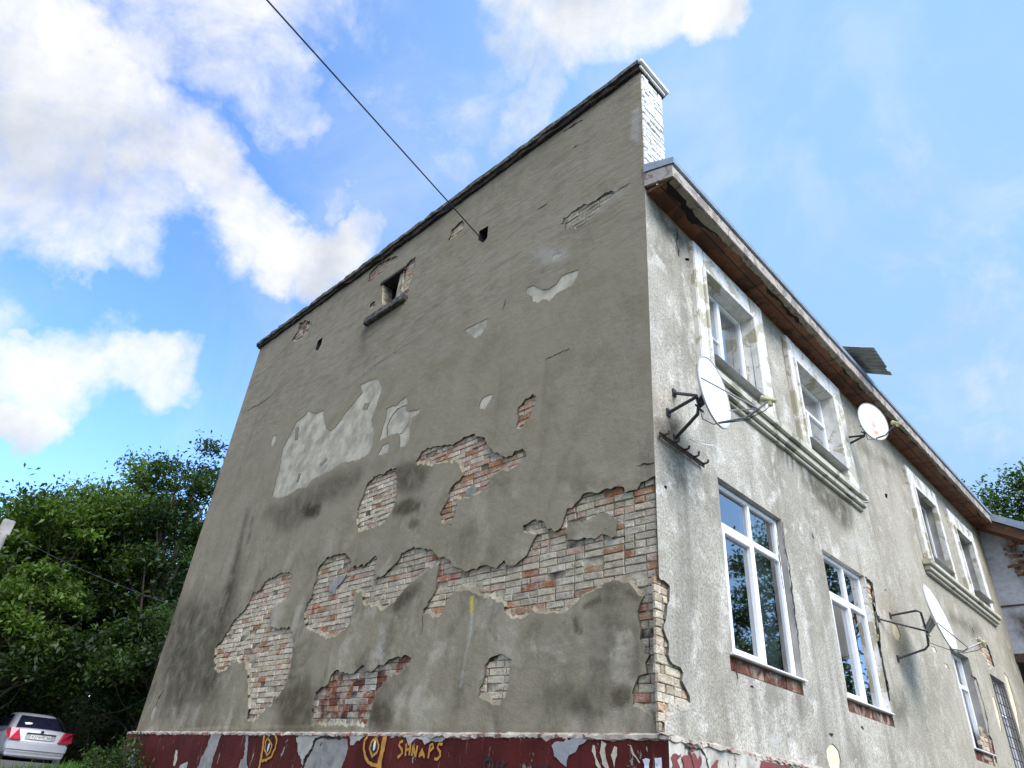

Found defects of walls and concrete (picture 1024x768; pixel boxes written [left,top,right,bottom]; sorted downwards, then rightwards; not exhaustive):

spalling [561,191,615,230]
spalling [368,256,416,298]
spalling [516,394,536,429]
spalling [415,434,526,526]
spalling [304,468,690,732]
spalling [214,572,294,722]
spalling [863,579,894,721]
spalling [296,655,411,768]
peeling [552,738,640,768]